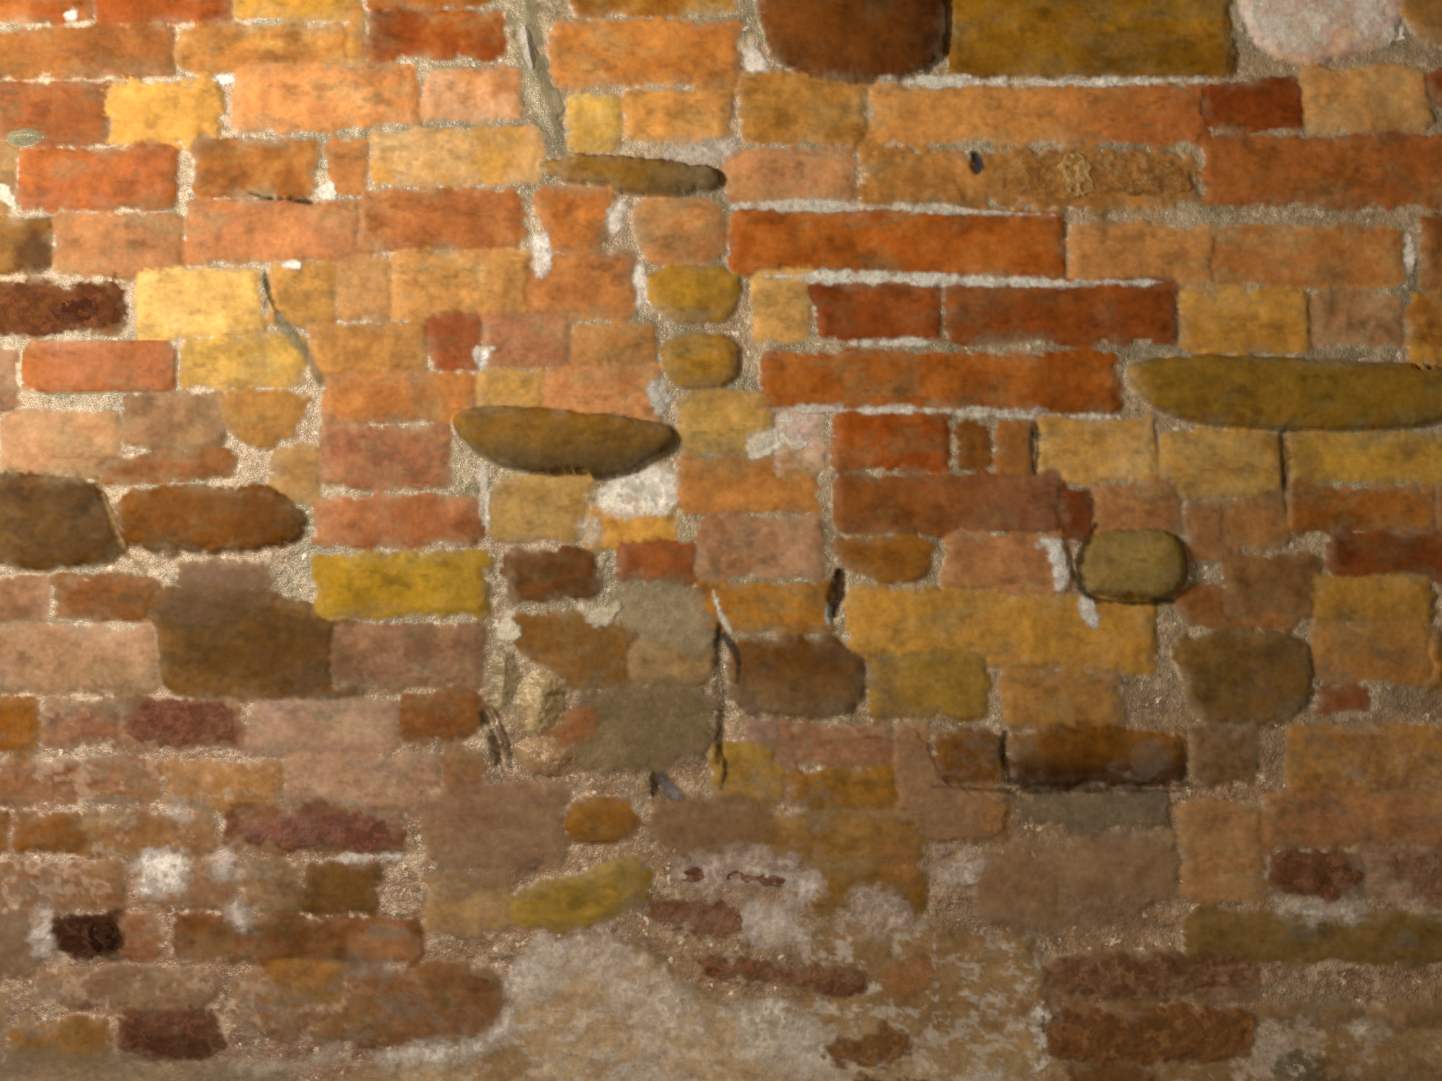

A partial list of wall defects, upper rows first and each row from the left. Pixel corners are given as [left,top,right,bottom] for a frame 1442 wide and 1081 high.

crack [264,277,320,383]
crack [715,623,740,781]
crack [481,708,511,772]
water stain [338,852,403,864]
water stain [31,911,51,953]
water stain [228,904,245,926]
efflorescence [674,847,819,948]
efflorescence [848,888,910,938]
water stain [1289,901,1357,925]
efflorescence [383,927,704,1064]
efflorescence [736,998,841,1081]
efflorescence [1030,1001,1052,1072]